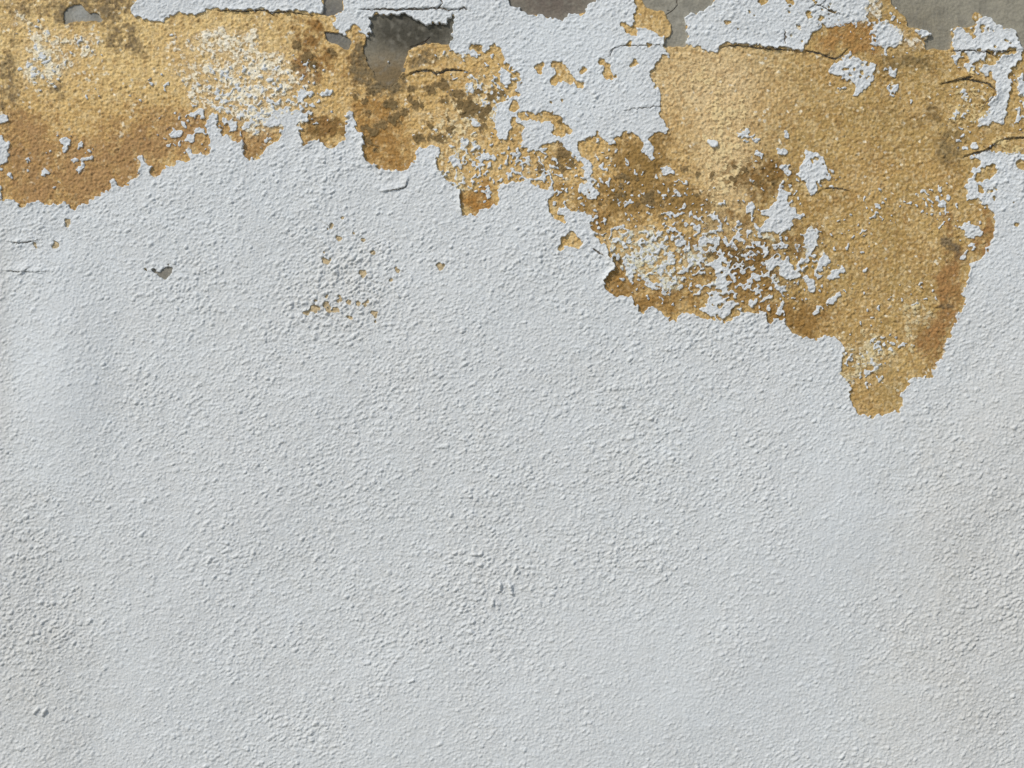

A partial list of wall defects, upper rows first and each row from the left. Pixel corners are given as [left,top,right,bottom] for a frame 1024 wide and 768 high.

crack [411,38,463,76]
crack [725,31,847,60]
crack [943,49,1011,105]
crack [968,136,1024,155]
peeling [0,0,1024,419]